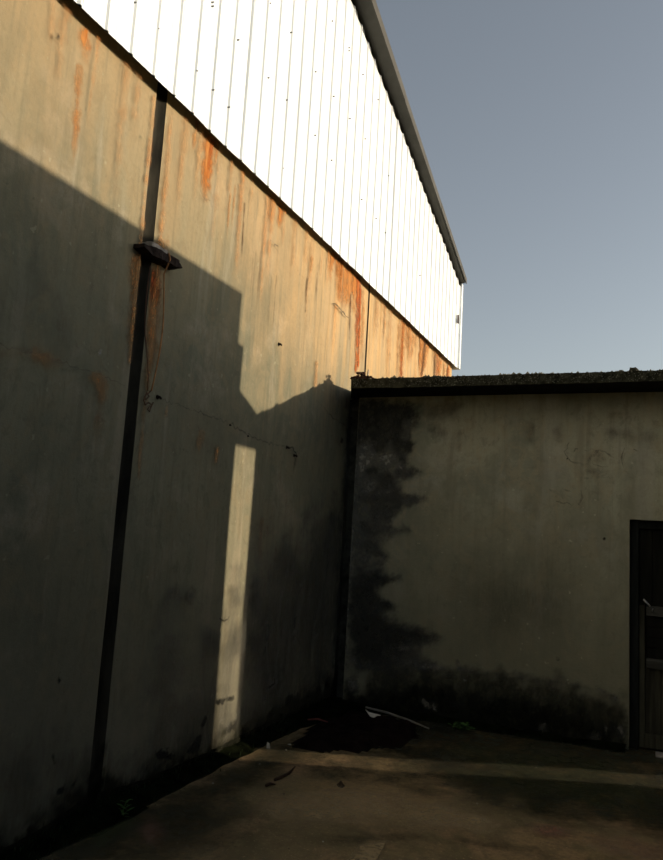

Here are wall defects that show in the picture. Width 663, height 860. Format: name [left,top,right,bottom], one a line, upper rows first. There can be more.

corrosion [193,120,220,190]
corrosion [130,256,141,343]
corrosion [330,251,364,372]
corrosion [388,321,450,376]
leakage [349,399,438,676]
leakage [37,715,663,860]